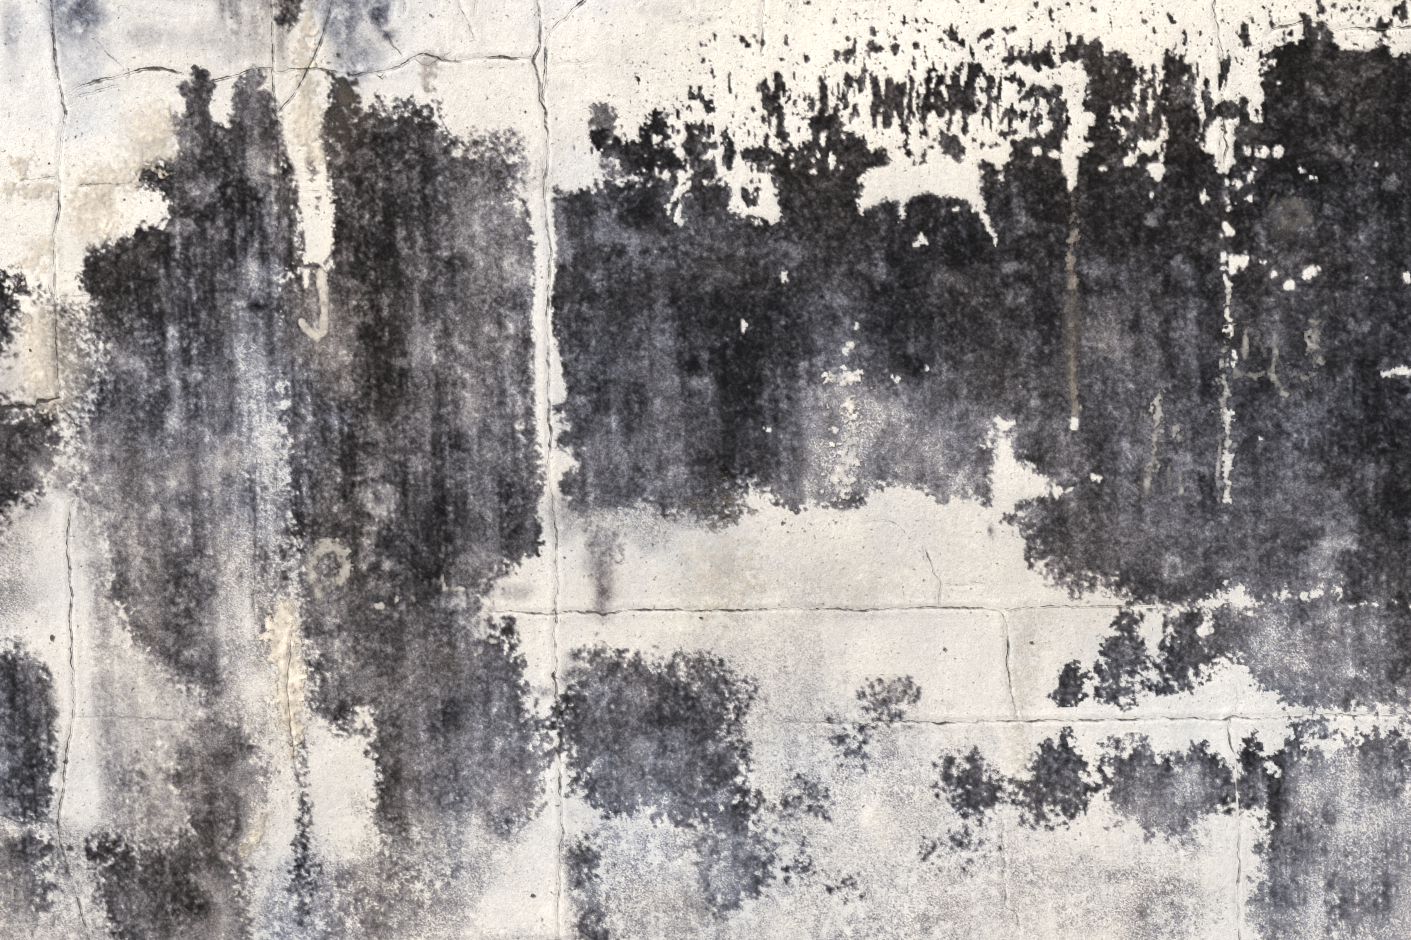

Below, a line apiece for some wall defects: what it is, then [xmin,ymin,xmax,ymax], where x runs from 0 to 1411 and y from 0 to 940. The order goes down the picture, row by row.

crack [0,0,184,430]
water stain [305,157,318,182]
crack [1212,0,1228,163]
crack [1269,20,1411,33]
crack [0,502,184,940]
crack [212,0,777,938]
water stain [550,99,1411,940]
crack [789,552,1401,889]